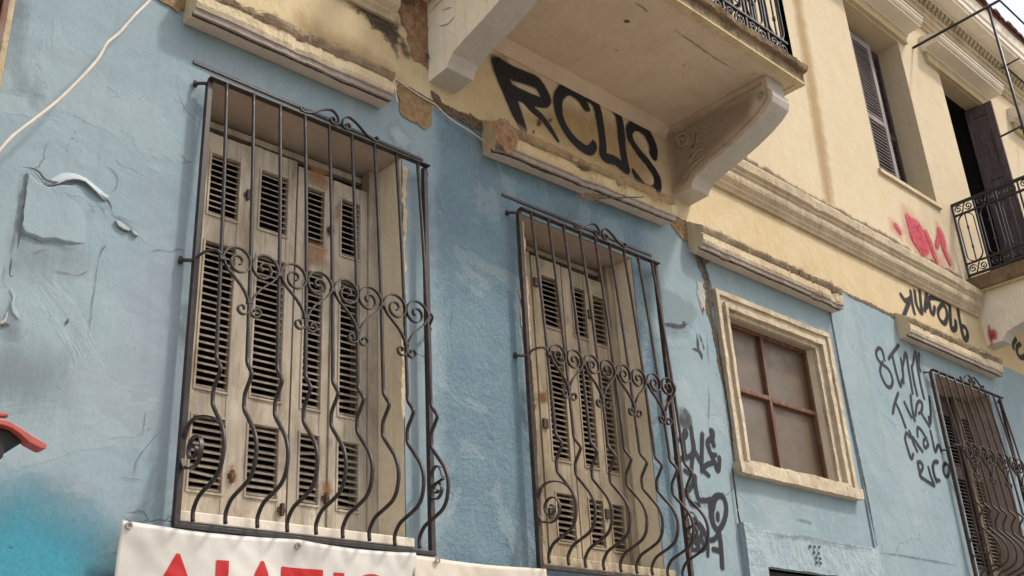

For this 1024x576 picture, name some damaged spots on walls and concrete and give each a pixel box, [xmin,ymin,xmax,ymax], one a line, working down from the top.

spalling [399,0,430,70]
peeling [390,83,432,151]
crack [55,166,182,340]